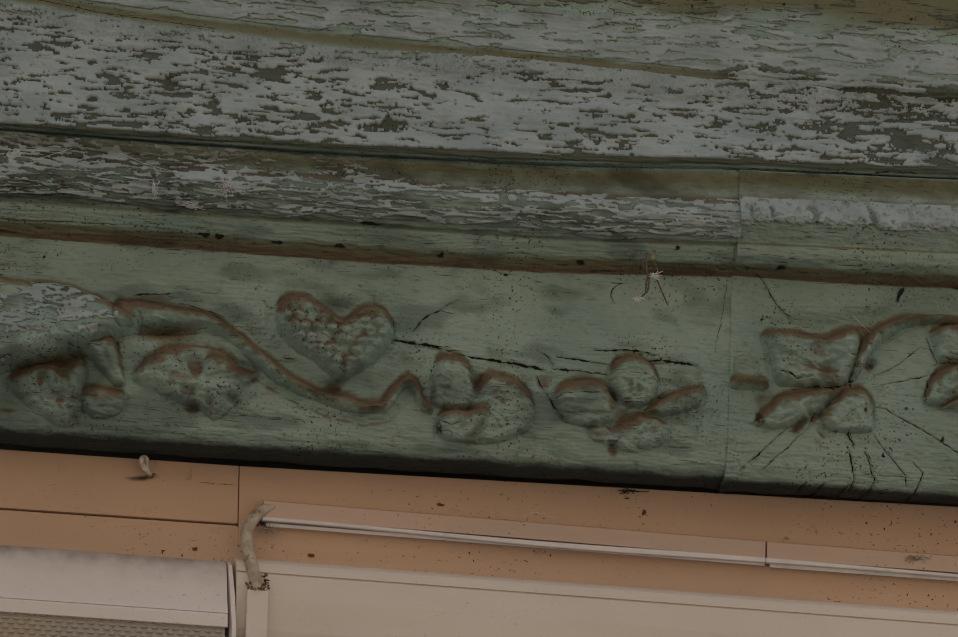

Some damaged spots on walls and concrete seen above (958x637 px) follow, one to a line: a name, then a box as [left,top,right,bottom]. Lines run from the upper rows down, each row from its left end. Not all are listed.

peeling [0,0,958,239]
peeling [0,280,119,339]
crack [394,299,693,423]
crack [751,340,958,469]
crack [797,426,923,497]